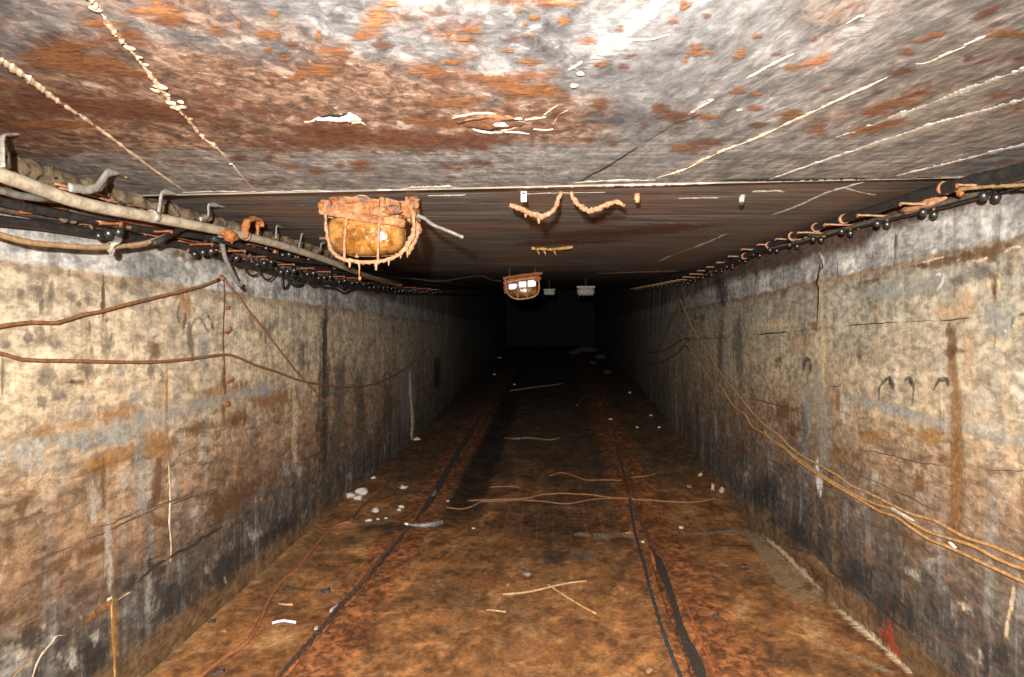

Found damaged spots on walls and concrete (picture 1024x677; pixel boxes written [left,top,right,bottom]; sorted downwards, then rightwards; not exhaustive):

rust [0,90,227,129]
spalling [305,113,366,136]
rust [254,0,568,173]
spalling [452,105,568,135]
rust [843,89,930,136]
crack [758,252,972,391]
damp [316,311,332,462]
damp [78,379,172,562]
crack [854,450,946,512]
rust [946,323,965,558]
damp [13,628,63,677]
damp [834,599,913,674]